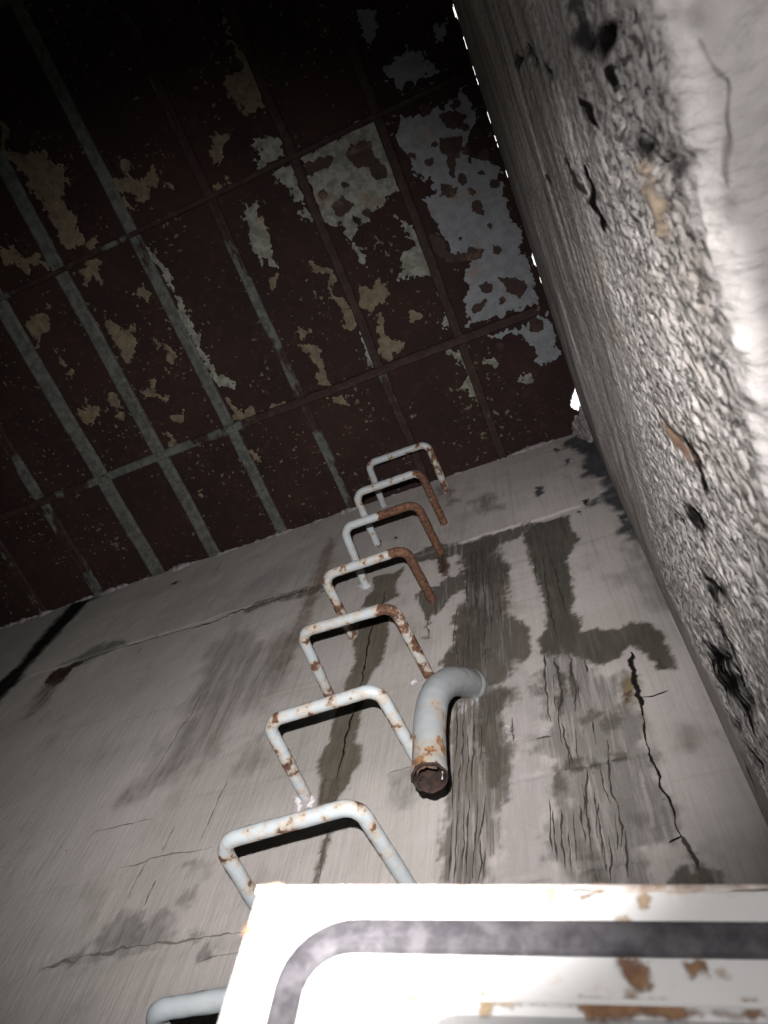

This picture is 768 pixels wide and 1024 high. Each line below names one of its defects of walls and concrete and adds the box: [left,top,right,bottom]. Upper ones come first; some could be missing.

peeling [0,120,103,287]
peeling [240,200,279,291]
peeling [251,87,561,385]
peeling [146,247,256,421]
damp [414,436,676,885]
crack [628,652,699,870]
spalling [669,499,707,536]
spalling [701,570,731,604]
spalling [704,618,765,771]
corrosion [578,957,696,1021]
corrosion [684,960,707,977]
corrosion [741,1001,763,1019]